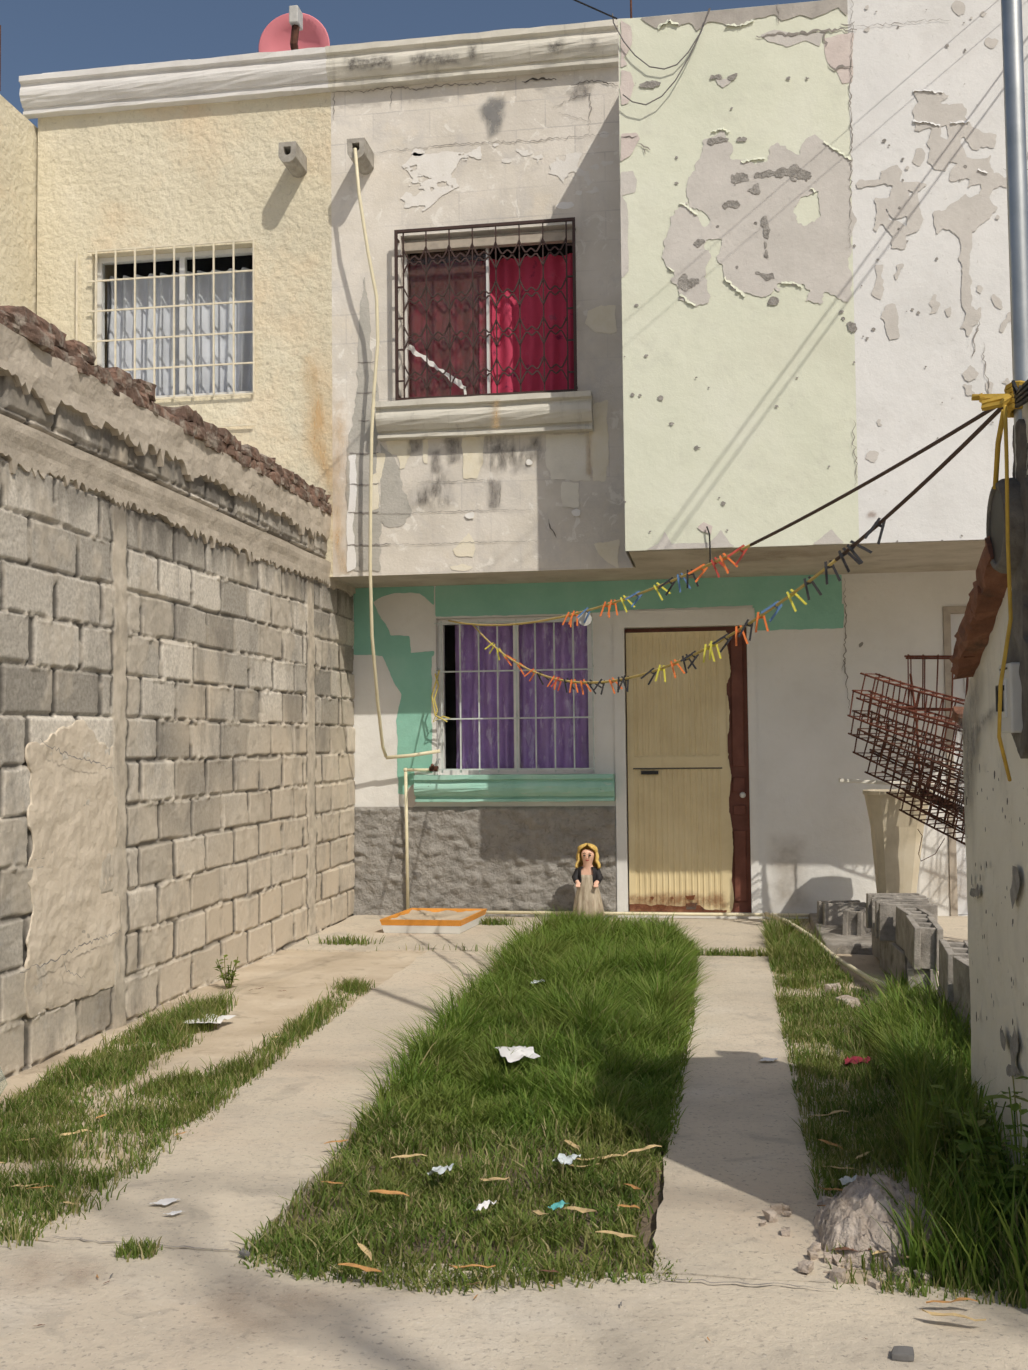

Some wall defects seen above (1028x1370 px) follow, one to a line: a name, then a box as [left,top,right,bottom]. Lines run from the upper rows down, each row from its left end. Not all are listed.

damp [349,57,391,70]
damp [411,47,475,65]
flaking render [710,73,737,87]
damp [482,99,503,134]
peeling [400,131,640,277]
peeling [662,89,1011,346]